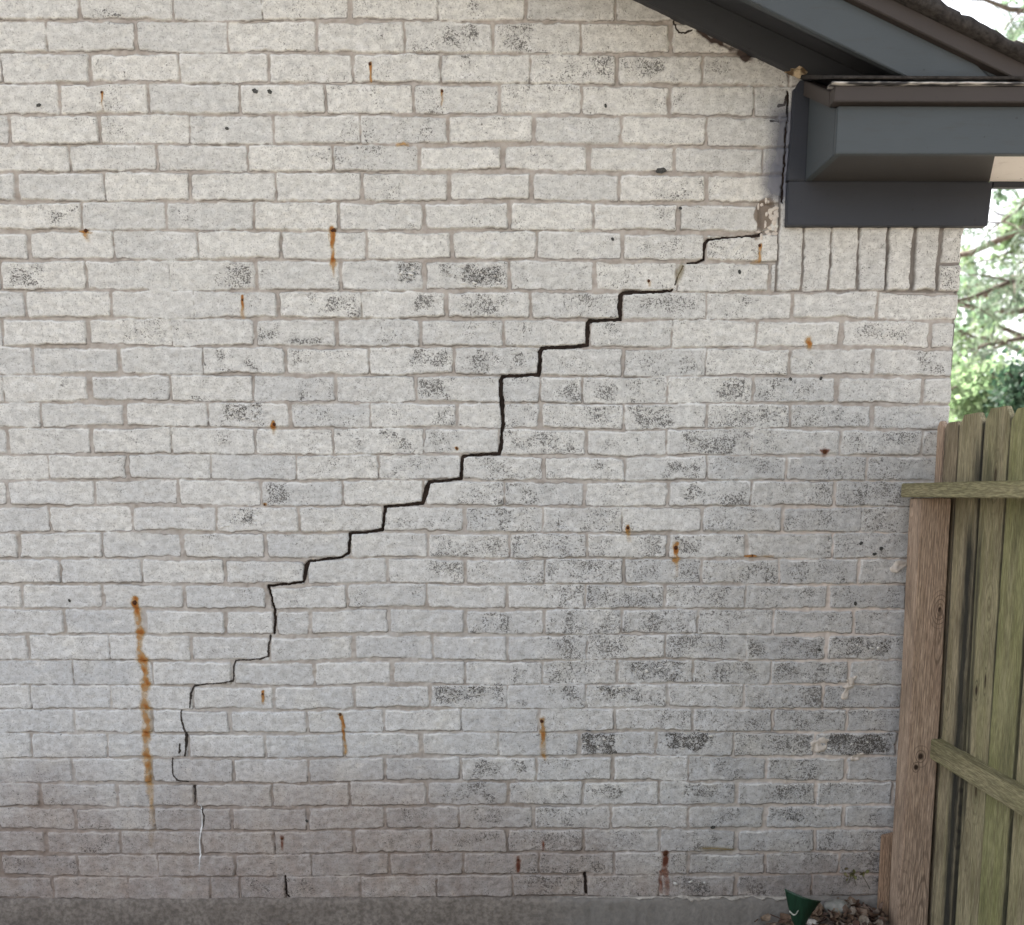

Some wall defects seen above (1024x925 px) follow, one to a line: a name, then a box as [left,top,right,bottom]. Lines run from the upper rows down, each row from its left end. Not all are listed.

crack [769,91,789,204]
spalling [754,197,779,240]
crack [172,233,760,865]
rust [131,596,152,785]
rust [659,850,669,890]